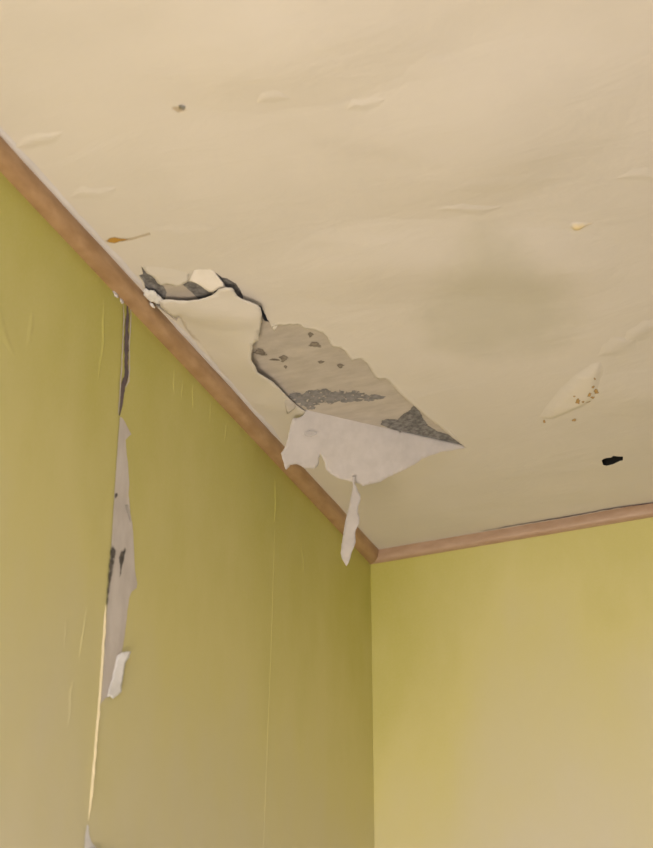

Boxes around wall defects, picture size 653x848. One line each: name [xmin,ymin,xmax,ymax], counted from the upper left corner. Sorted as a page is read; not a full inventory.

peeling [140,266,243,309]
peeling [251,317,465,566]
peeling [84,417,137,848]